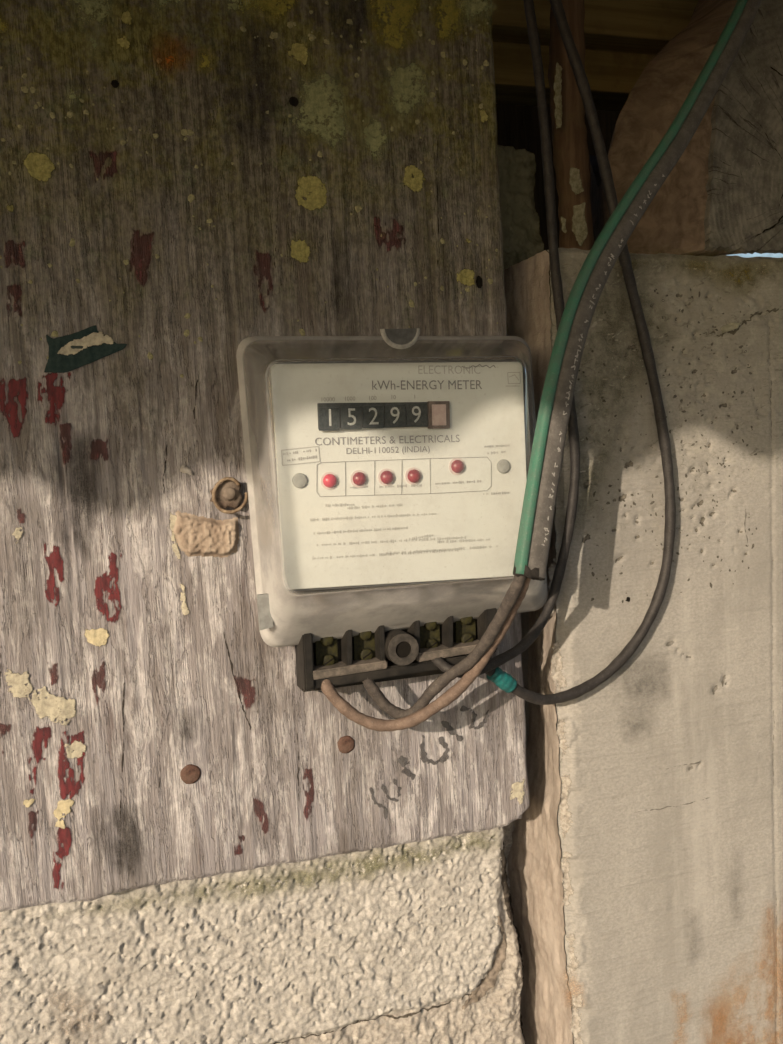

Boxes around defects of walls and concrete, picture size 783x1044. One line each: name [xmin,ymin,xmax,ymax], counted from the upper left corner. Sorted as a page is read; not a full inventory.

peeling [0,372,72,465]
peeling [86,439,109,461]
peeling [44,543,64,606]
peeling [94,552,122,623]
peeling [47,662,59,686]
peeling [91,661,106,704]
peeling [27,726,85,800]
peeling [28,811,38,844]
peeling [52,827,72,889]
crack [274,977,486,1044]